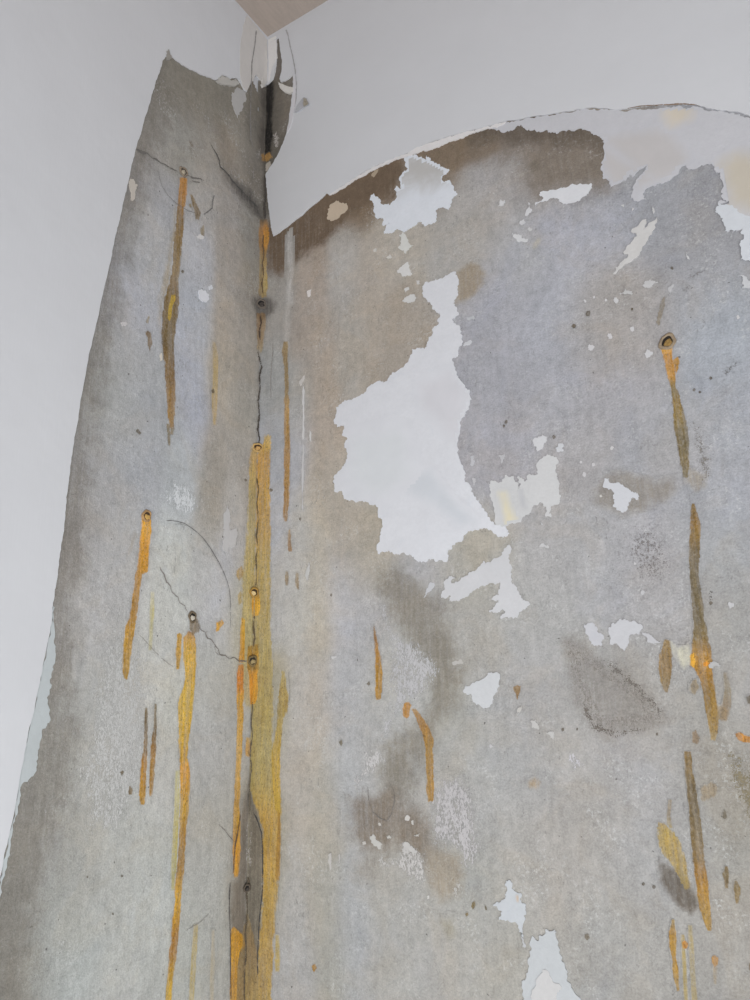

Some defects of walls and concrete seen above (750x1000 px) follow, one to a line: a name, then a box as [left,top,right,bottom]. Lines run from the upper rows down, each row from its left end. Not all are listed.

corrosion [144,176,206,447]
crack [136,145,273,443]
water stain [222,158,407,321]
water stain [454,260,488,307]
water stain [415,117,632,208]
corrosion [165,631,197,1000]
crack [160,567,256,662]
crack [247,702,255,814]
crack [253,479,261,586]
corrosion [229,340,300,1000]
spalling [258,103,750,1000]
corrosion [656,347,732,1000]